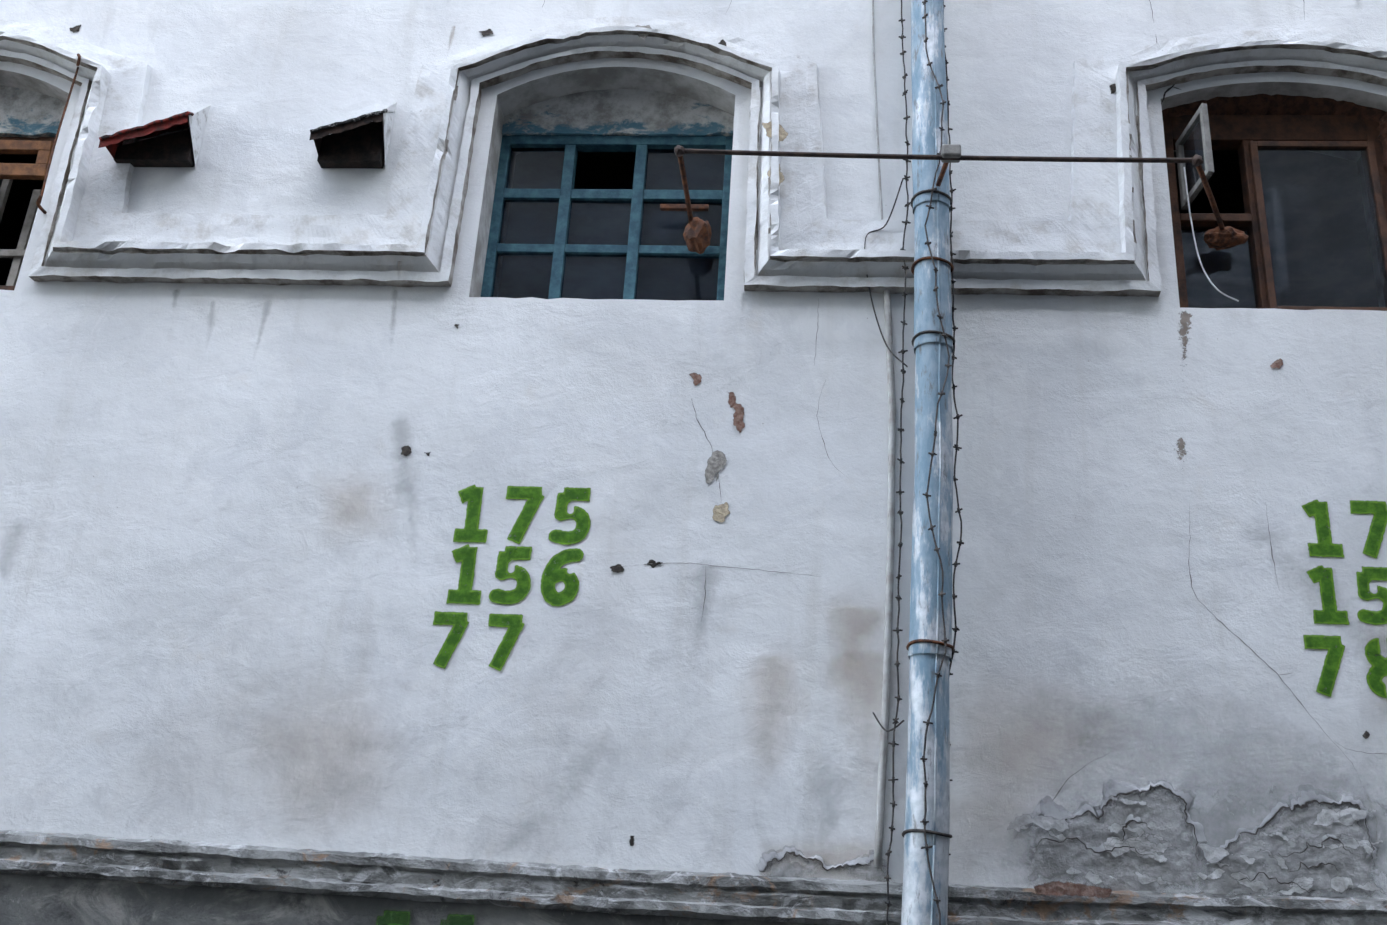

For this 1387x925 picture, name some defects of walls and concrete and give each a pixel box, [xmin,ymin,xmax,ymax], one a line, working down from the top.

flaking render [728,392,745,433]
flaking render [705,450,727,484]
flaking render [712,502,730,522]
crack [1188,507,1383,862]
flaking render [756,845,886,879]
flaking render [1007,779,1387,908]